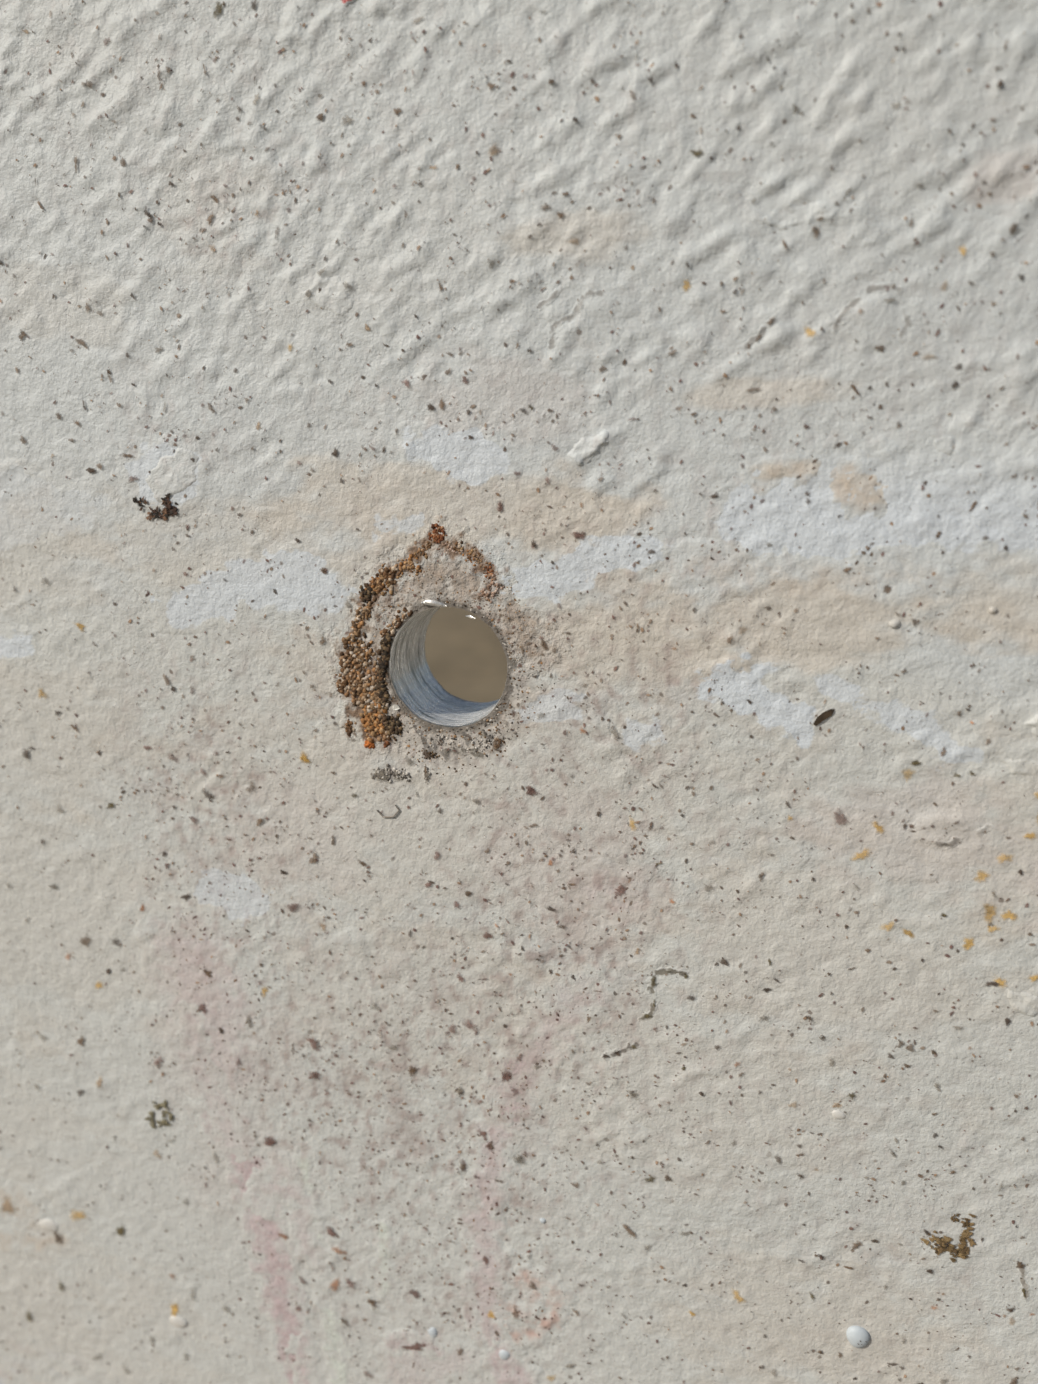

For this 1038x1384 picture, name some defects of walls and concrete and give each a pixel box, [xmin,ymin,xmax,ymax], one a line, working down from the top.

corrosion [321,512,572,784]